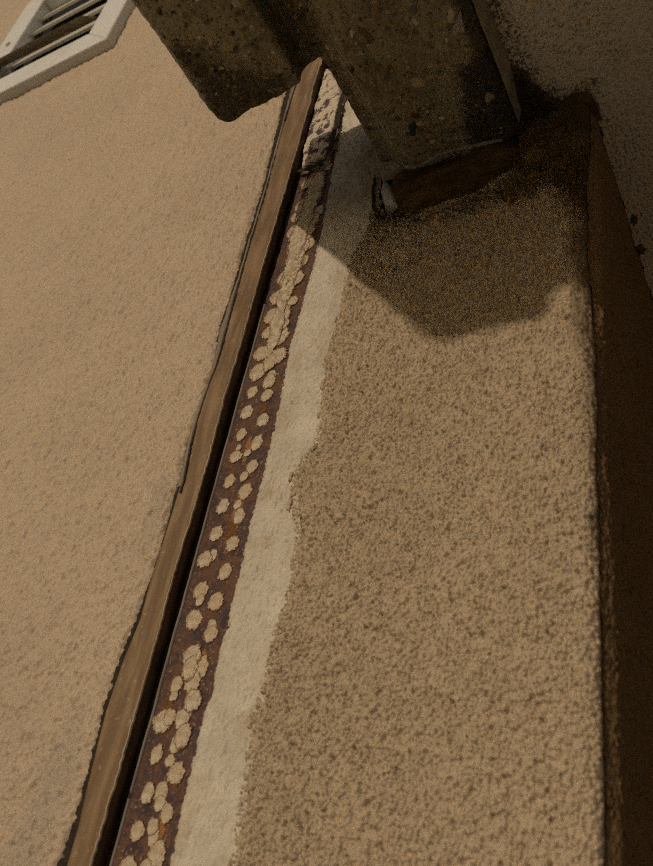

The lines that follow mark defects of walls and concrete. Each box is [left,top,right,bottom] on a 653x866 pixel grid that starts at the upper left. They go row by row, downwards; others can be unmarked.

peeling [170,69,520,866]
leakage [368,0,604,249]